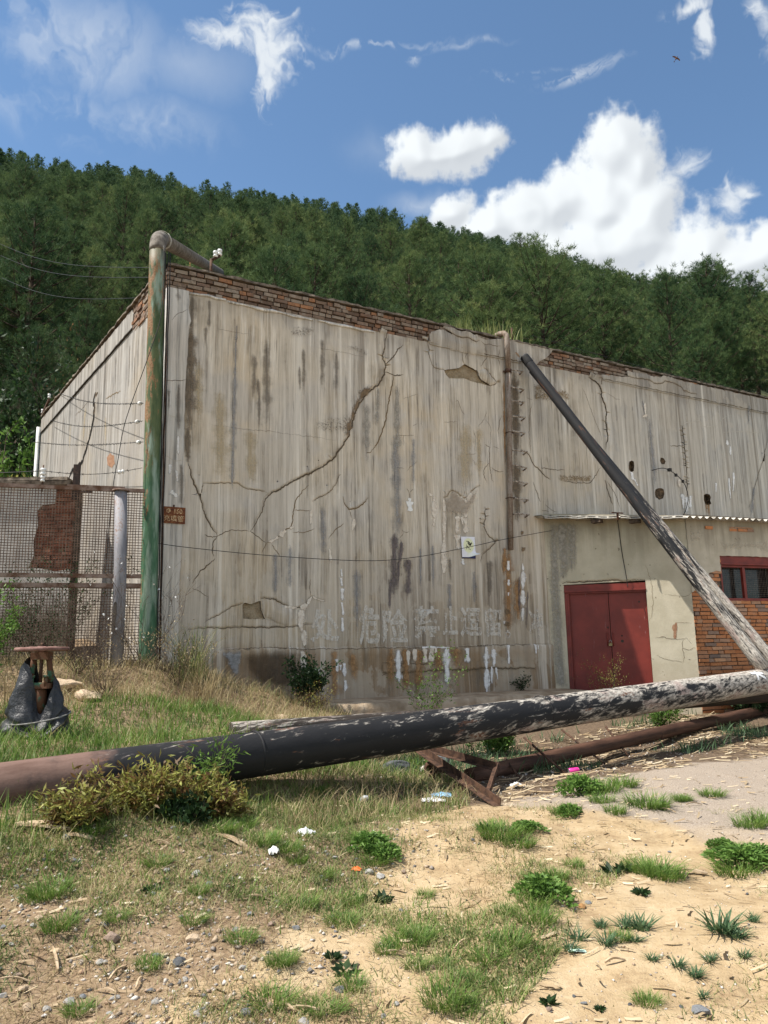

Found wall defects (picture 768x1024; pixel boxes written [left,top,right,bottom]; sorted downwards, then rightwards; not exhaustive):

crack [69,392,119,478]
damp [169,297,210,501]
crack [166,323,545,676]
flaking render [444,364,490,386]
damp [512,379,520,450]
crack [441,371,697,559]
flaking render [243,601,281,628]
damp [223,596,324,684]
damp [395,646,450,682]
damp [389,492,473,607]
damp [484,645,510,692]
damp [507,561,529,620]